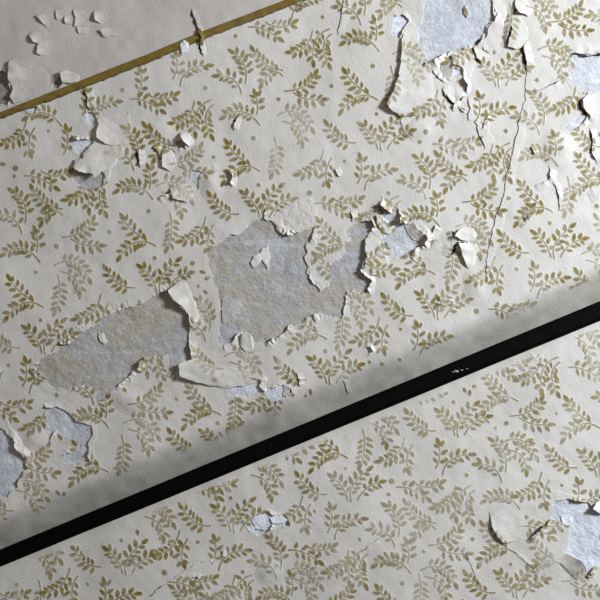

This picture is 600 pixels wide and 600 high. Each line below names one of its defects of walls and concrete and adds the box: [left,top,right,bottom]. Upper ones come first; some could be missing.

peeling [0,59,80,117]
peeling [29,8,122,56]
peeling [385,0,533,117]
peeling [560,46,600,135]
peeling [65,106,134,194]
peeling [162,133,195,171]
crack [431,3,600,287]
peeling [200,198,435,353]
peeling [455,226,479,269]
peeling [28,281,297,472]
peeling [0,418,34,503]
peeling [489,490,600,586]